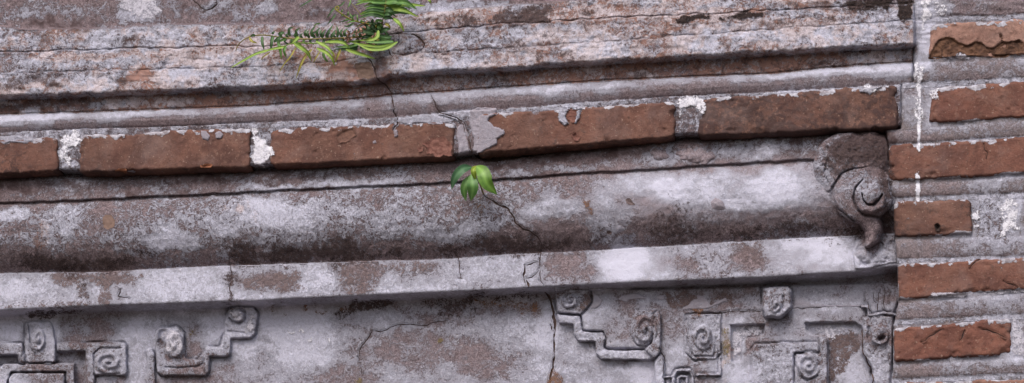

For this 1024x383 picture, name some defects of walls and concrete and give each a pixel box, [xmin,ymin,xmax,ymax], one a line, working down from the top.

spalling [928,34,1024,59]
crack [366,32,426,130]
flaking render [393,107,505,157]
crack [484,195,558,383]
crack [357,319,448,376]